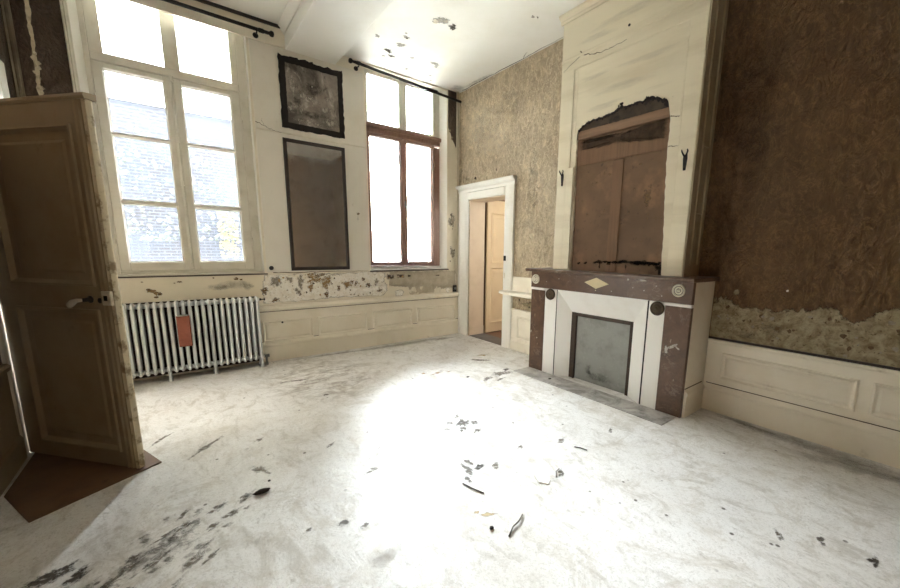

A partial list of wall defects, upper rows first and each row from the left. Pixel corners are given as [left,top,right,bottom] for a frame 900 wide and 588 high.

peeling [261,246,456,304]